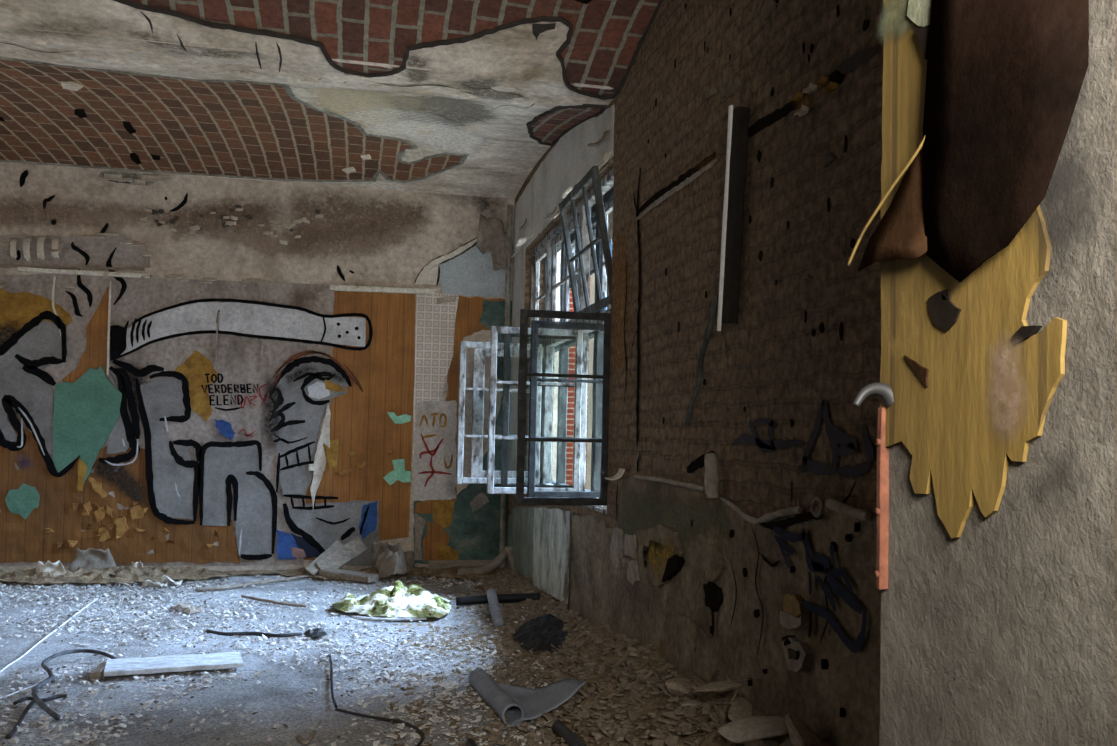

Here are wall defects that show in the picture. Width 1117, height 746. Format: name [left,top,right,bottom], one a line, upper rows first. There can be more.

flaking render [0,0,664,186]
water stain [0,195,425,258]
peeling [414,130,612,305]
peeling [605,451,873,587]
peeling [703,544,726,637]
flaking render [780,594,829,672]